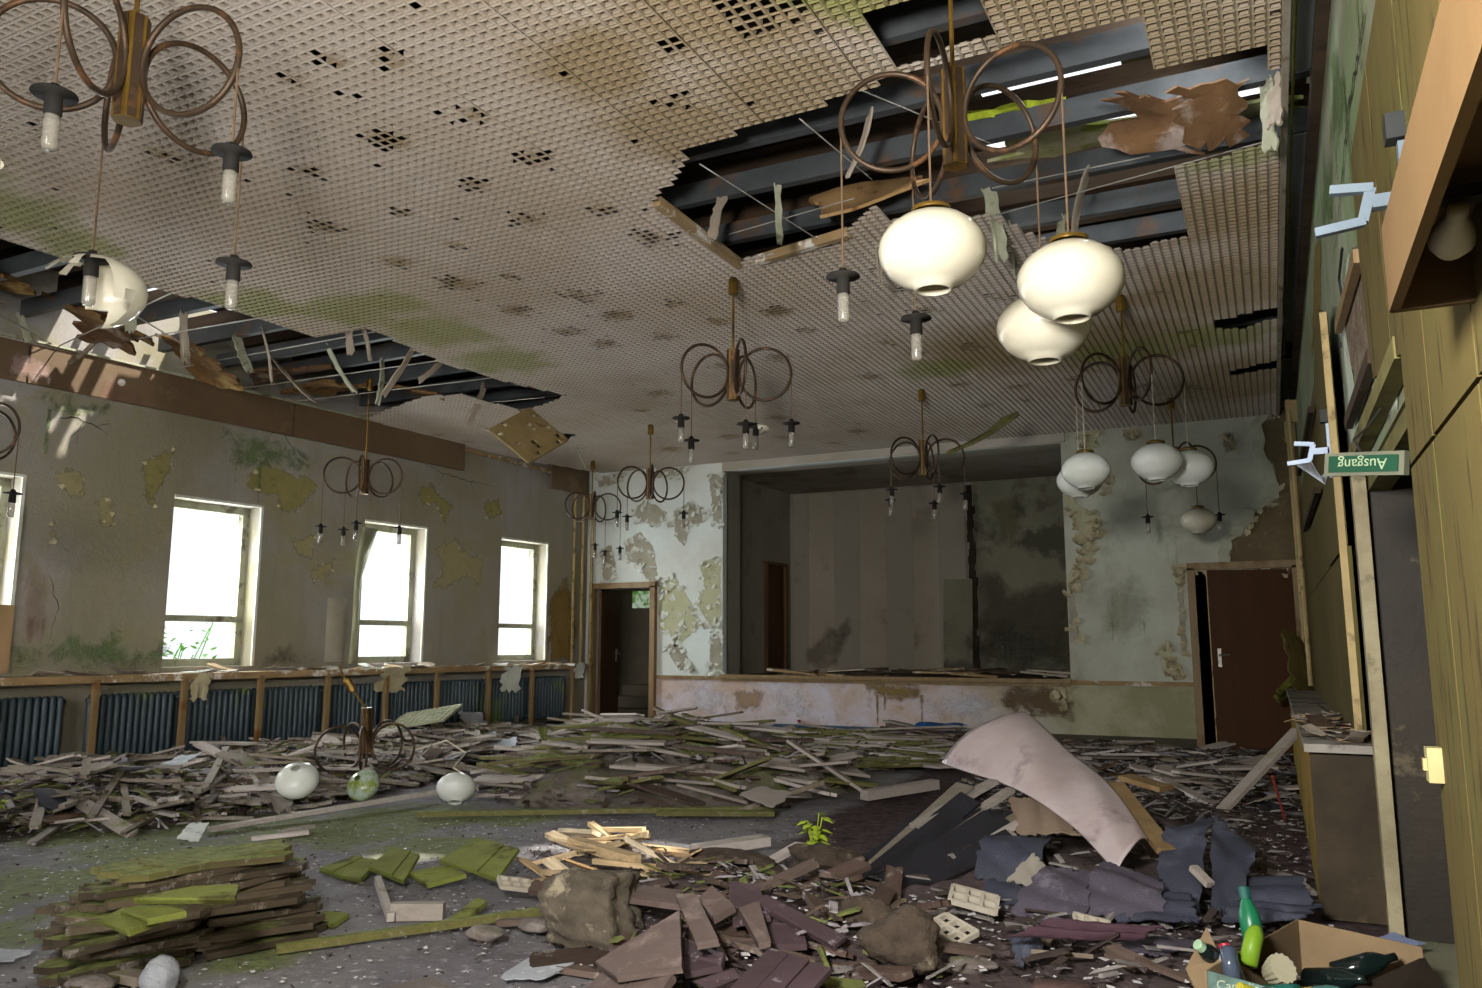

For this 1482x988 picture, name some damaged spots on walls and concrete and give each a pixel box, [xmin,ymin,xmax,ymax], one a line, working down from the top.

peeling [142,447,175,508]
peeling [247,464,317,512]
peeling [348,527,378,664]
peeling [594,466,689,489]
peeling [597,471,725,678]
water stain [983,575,1070,664]
peeling [1062,472,1115,645]
flaking render [1155,399,1301,681]